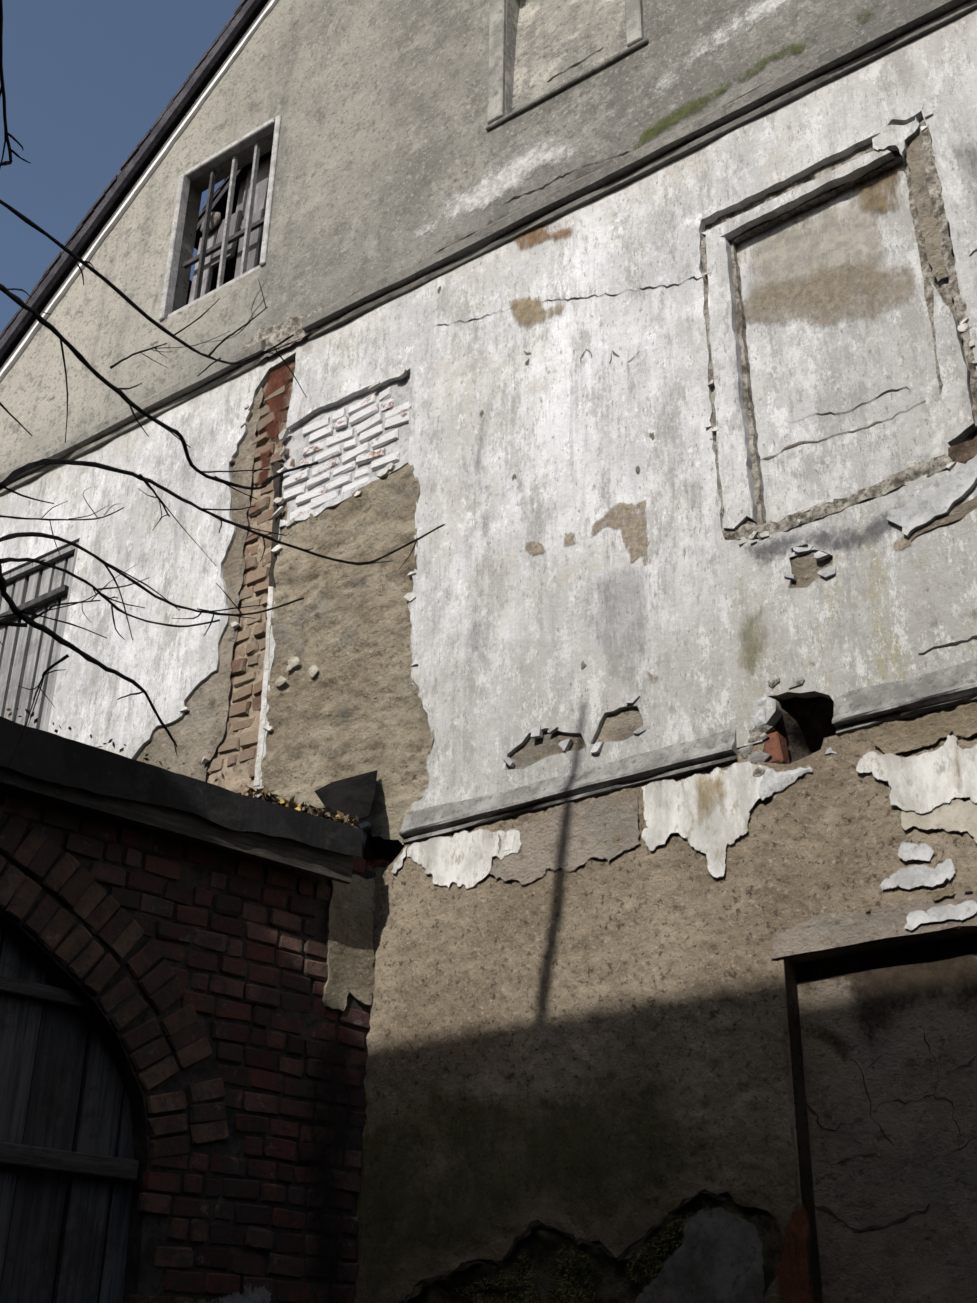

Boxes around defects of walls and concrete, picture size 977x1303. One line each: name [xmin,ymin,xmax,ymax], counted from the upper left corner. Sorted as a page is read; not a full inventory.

leakage [687,0,790,65]
leakage [416,138,591,237]
crack [437,276,703,325]
spalling [700,111,977,588]
crack [760,387,926,460]
flaking render [135,360,412,797]
peeling [404,571,416,602]
peeling [591,500,647,565]
flaking render [359,677,845,888]
flaking render [856,702,977,931]
crack [806,1027,977,1166]
crack [814,1204,930,1232]